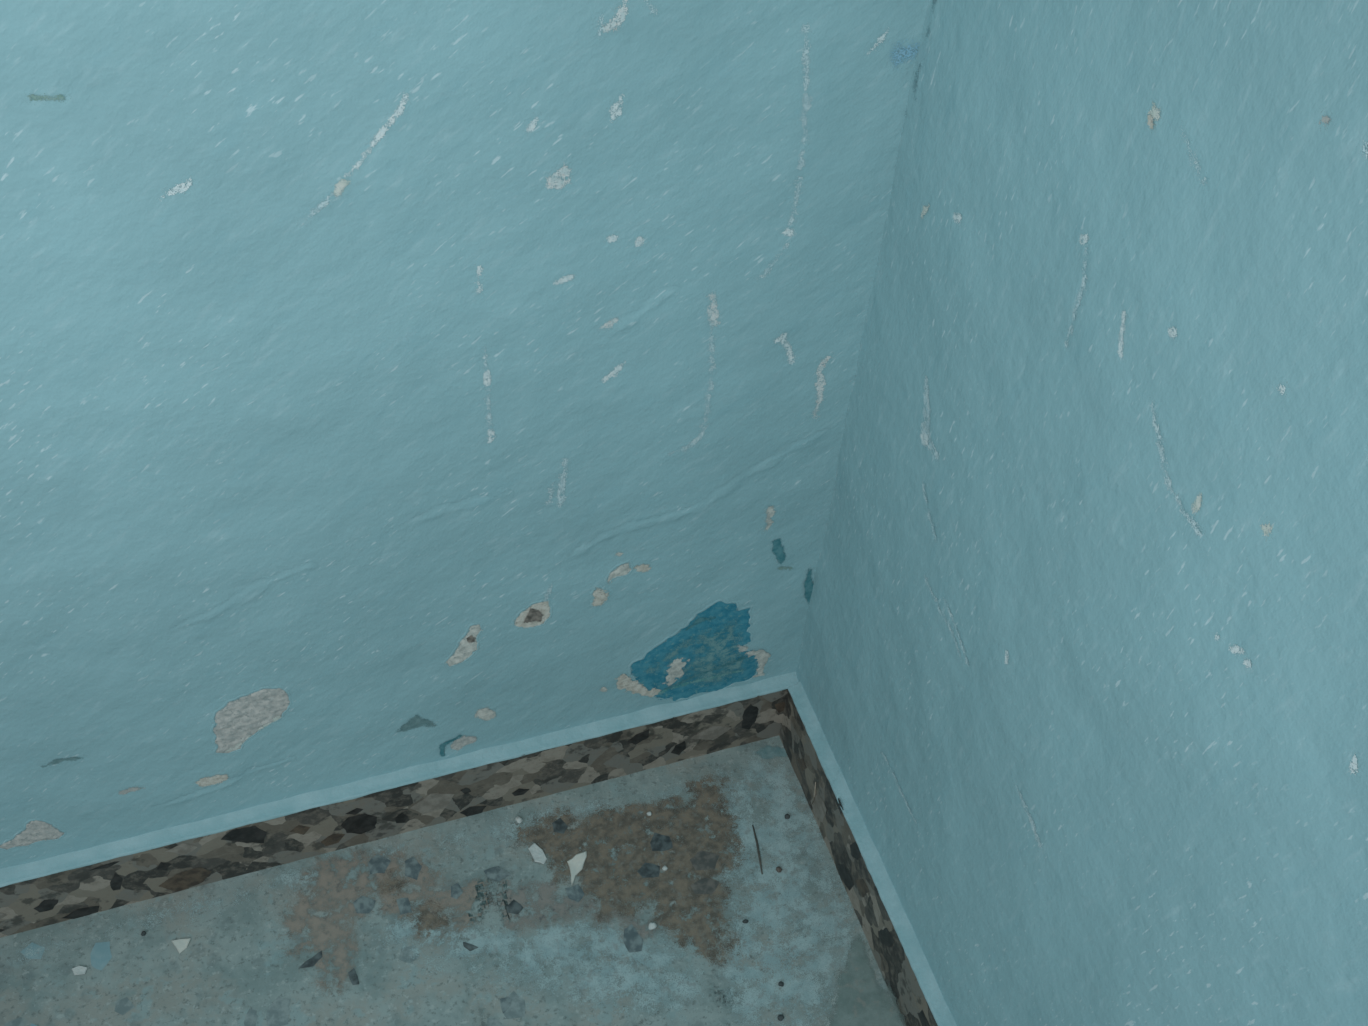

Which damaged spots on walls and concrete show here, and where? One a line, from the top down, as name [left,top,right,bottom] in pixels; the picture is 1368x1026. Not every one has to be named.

spalling [511,586,553,629]
spalling [443,622,484,668]
peeling [600,599,771,702]
spalling [210,686,292,754]
spalling [0,819,67,851]